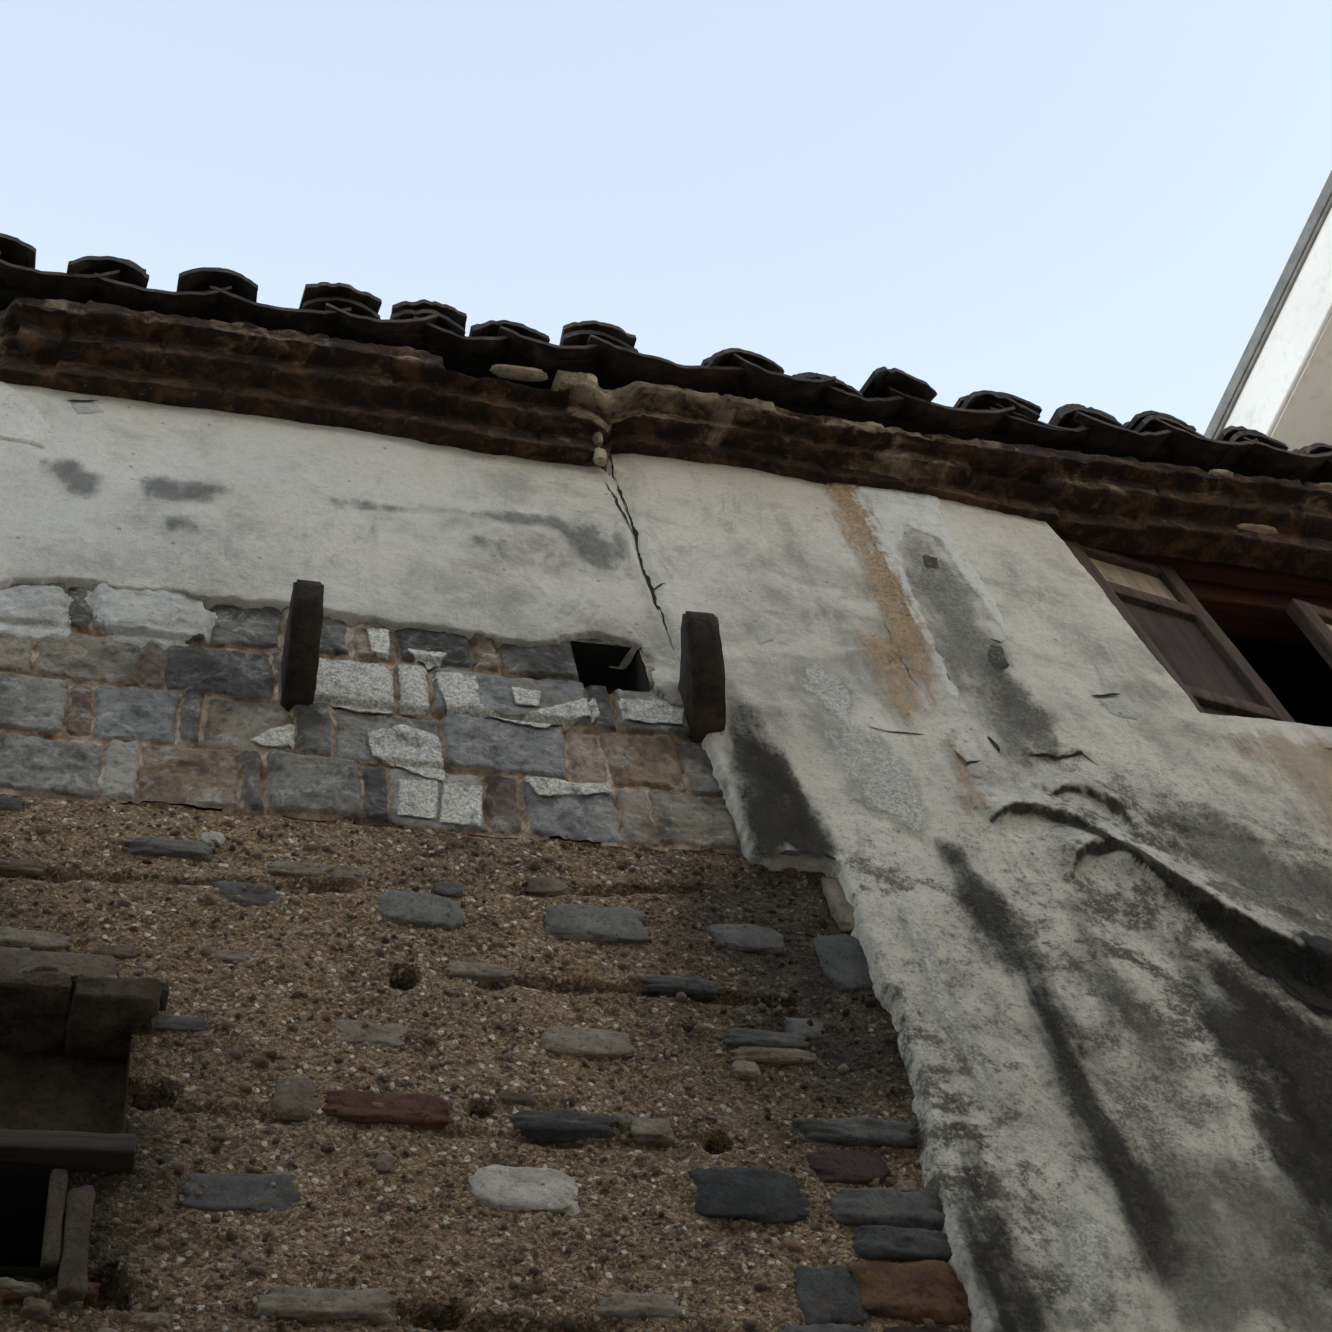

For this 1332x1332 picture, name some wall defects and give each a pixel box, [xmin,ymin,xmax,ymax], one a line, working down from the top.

flaking render [0,583,744,856]
crack [605,454,679,658]
water stain [731,709,835,858]
rust [827,483,932,720]
water stain [908,542,1058,767]
water stain [937,785,1332,1332]